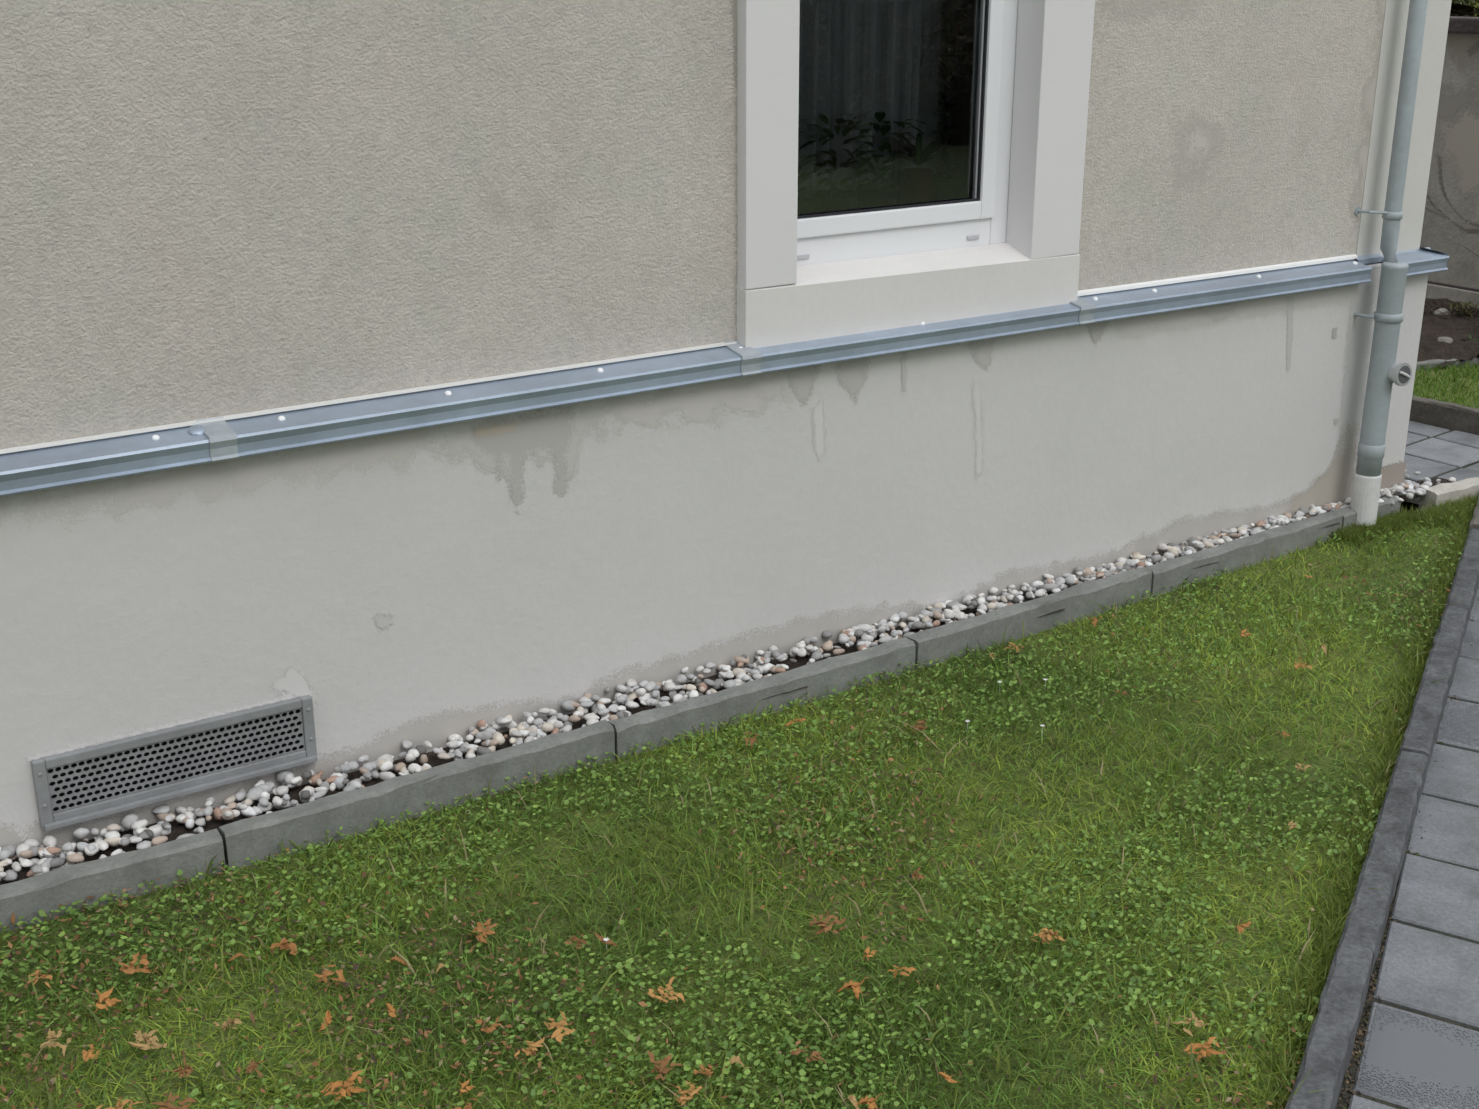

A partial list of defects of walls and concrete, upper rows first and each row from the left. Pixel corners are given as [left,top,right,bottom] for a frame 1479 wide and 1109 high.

water stain [0,284,1376,849]